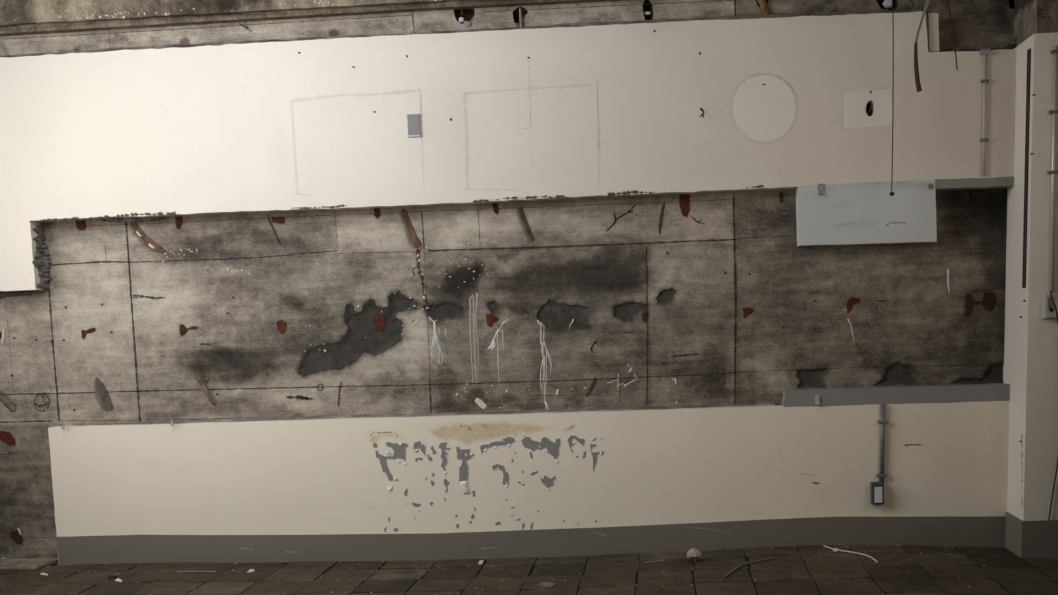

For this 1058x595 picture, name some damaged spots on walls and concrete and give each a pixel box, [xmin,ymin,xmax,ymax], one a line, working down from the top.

corrosion [847,297,860,313]
corrosion [965,292,996,316]
damp [446,268,480,386]
corrosion [486,314,498,327]
damp [429,317,446,365]
damp [537,320,552,410]
spalling [796,367,828,388]
spalling [873,362,917,386]
corrosion [0,431,16,446]
peeling [373,435,604,530]
corrosion [10,528,23,545]